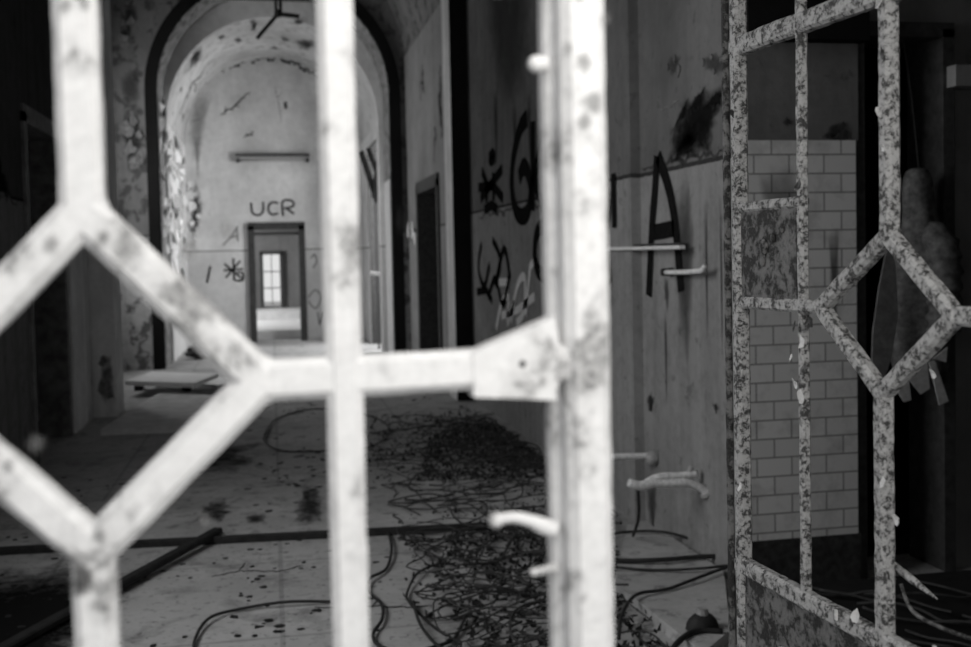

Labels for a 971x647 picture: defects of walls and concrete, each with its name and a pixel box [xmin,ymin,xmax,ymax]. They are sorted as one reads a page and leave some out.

flaking render [118,116,146,169]
peeling [159,97,202,277]